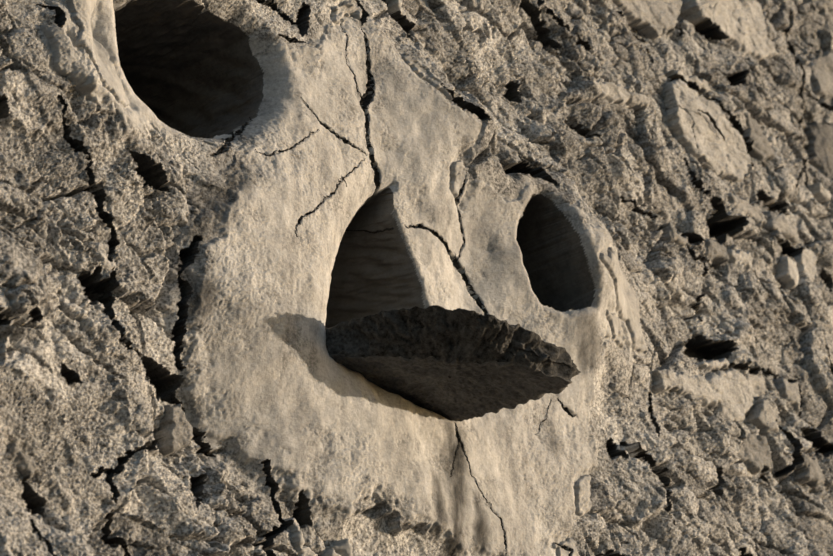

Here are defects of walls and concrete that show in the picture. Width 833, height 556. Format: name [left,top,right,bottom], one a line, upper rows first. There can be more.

crack [210,0,406,239]
crack [167,235,203,372]
crack [345,170,488,315]
crack [90,437,163,556]
crack [169,393,216,457]
crack [254,459,294,556]
crack [450,423,507,554]